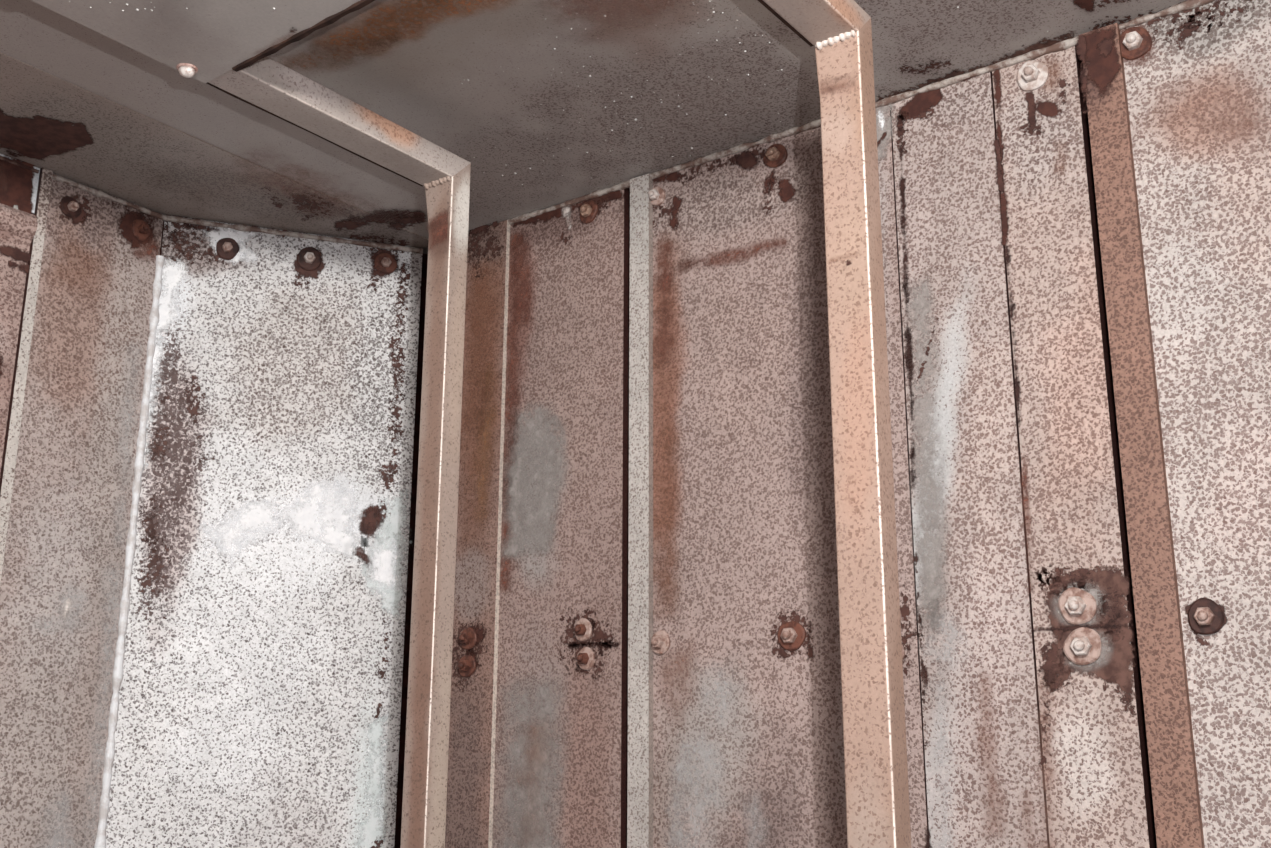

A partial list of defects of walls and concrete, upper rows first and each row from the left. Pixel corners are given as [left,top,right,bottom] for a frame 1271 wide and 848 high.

peeling [0,109,94,214]
rust [56,194,91,226]
rust [112,197,224,264]
rust [256,170,448,293]
rust [770,609,814,660]
rust [1033,565,1136,775]